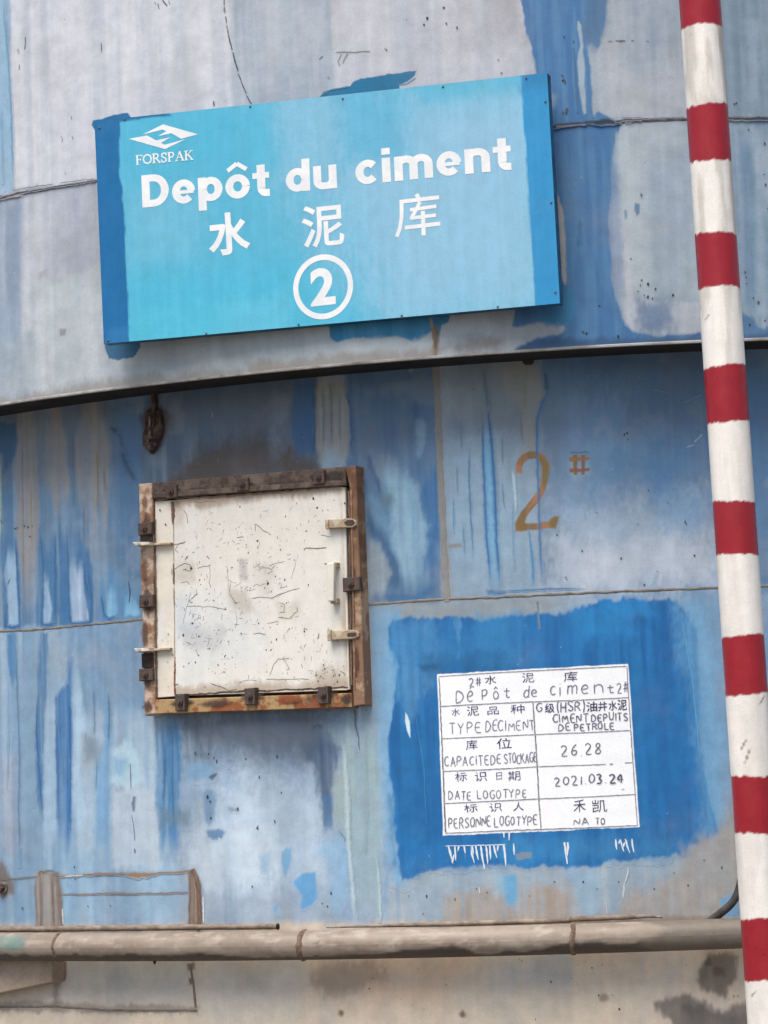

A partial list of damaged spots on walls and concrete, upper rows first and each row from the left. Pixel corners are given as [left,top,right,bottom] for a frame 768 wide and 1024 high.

corrosion [141,471,359,711]
corrosion [0,855,205,933]
leakage [650,949,747,1024]